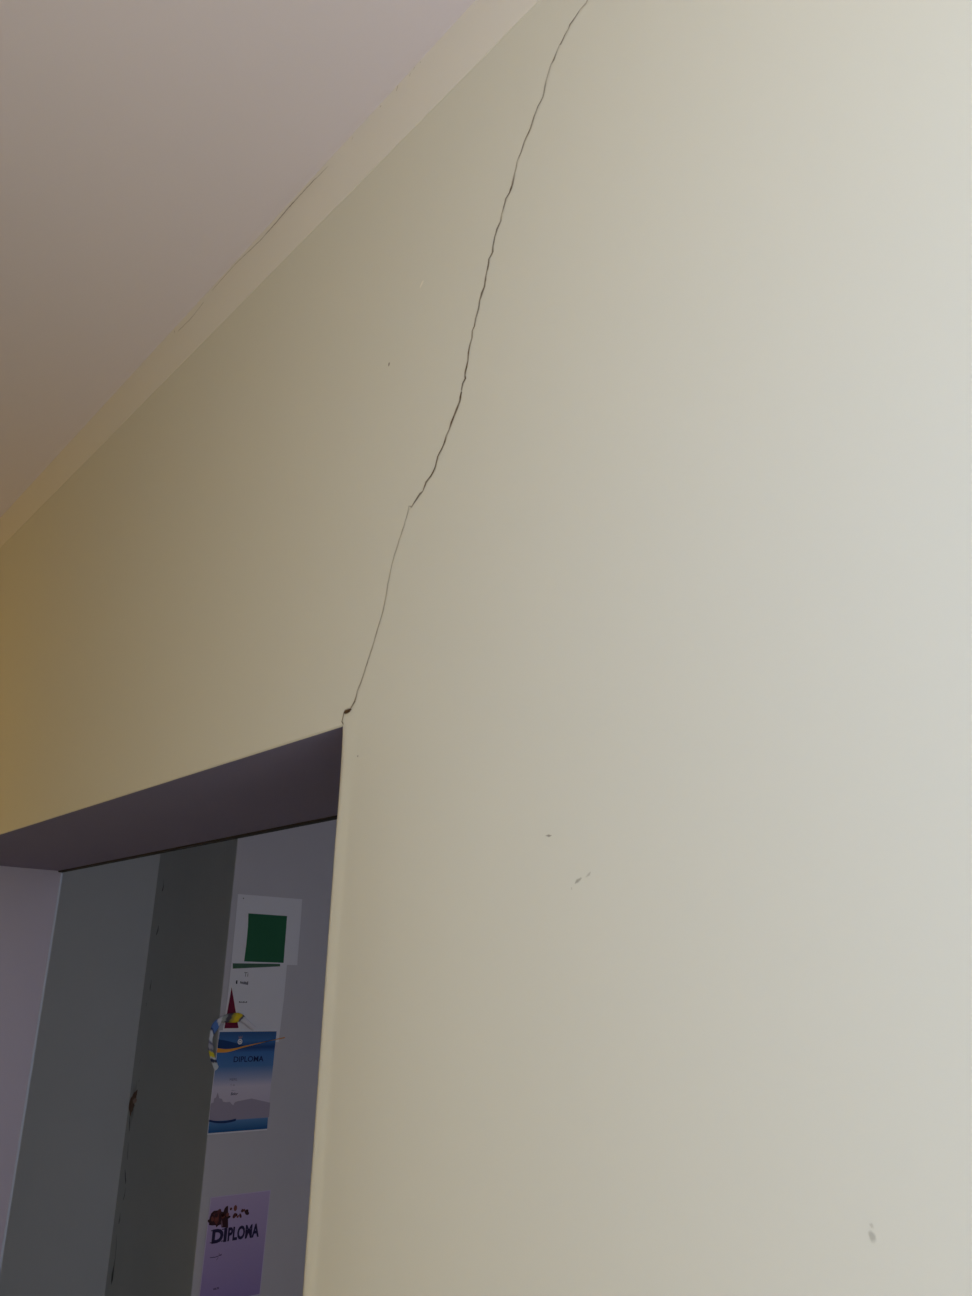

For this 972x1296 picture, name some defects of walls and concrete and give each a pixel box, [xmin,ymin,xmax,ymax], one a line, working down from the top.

crack [413,97,543,504]